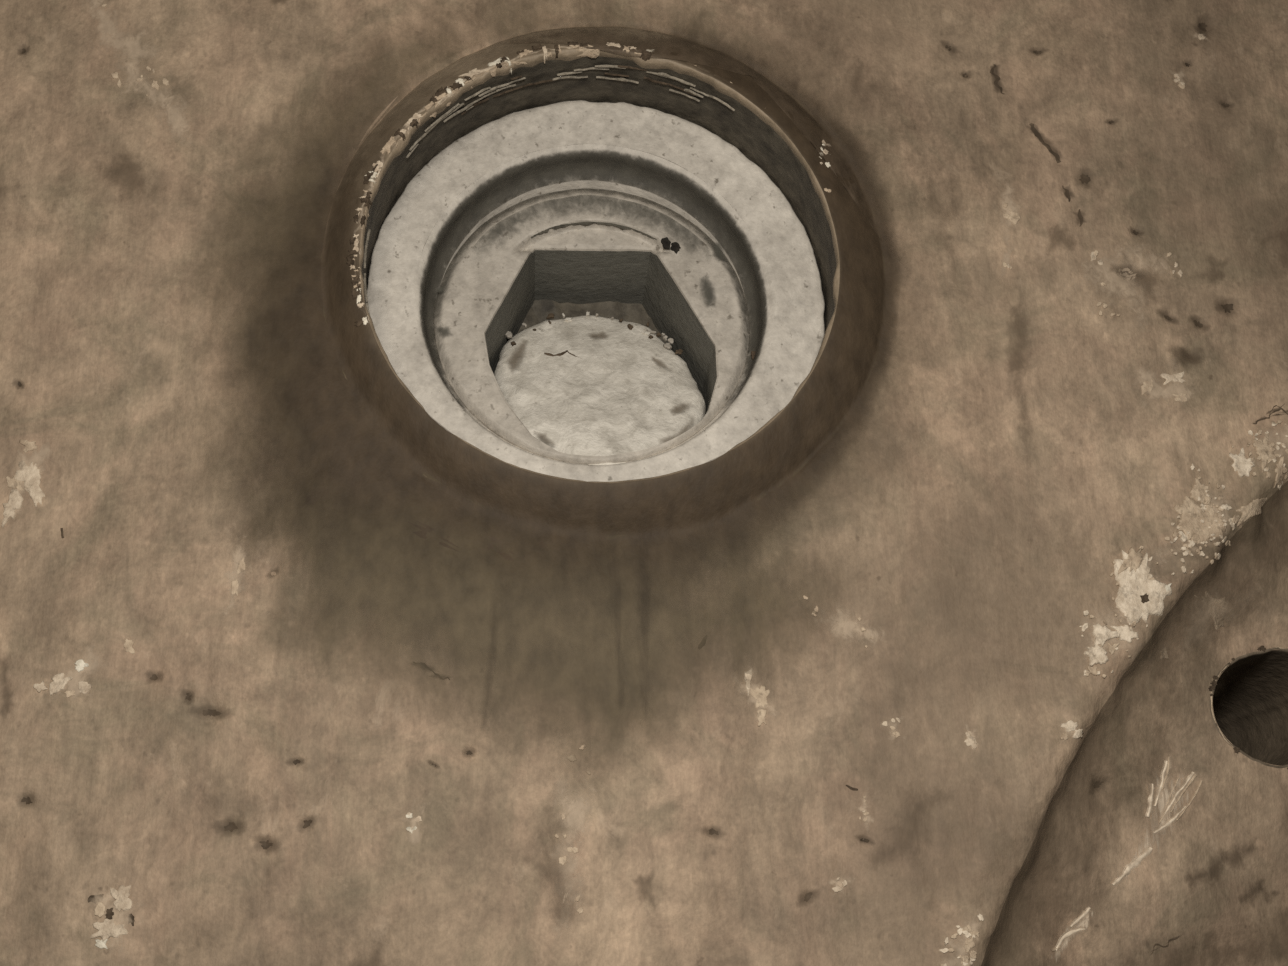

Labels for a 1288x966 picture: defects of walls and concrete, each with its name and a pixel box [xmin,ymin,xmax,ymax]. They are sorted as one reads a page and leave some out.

damp [237,43,895,743]
peeling [1,439,50,528]
spalling [1079,420,1288,679]
peeling [1208,658,1240,754]
peeling [88,885,135,949]